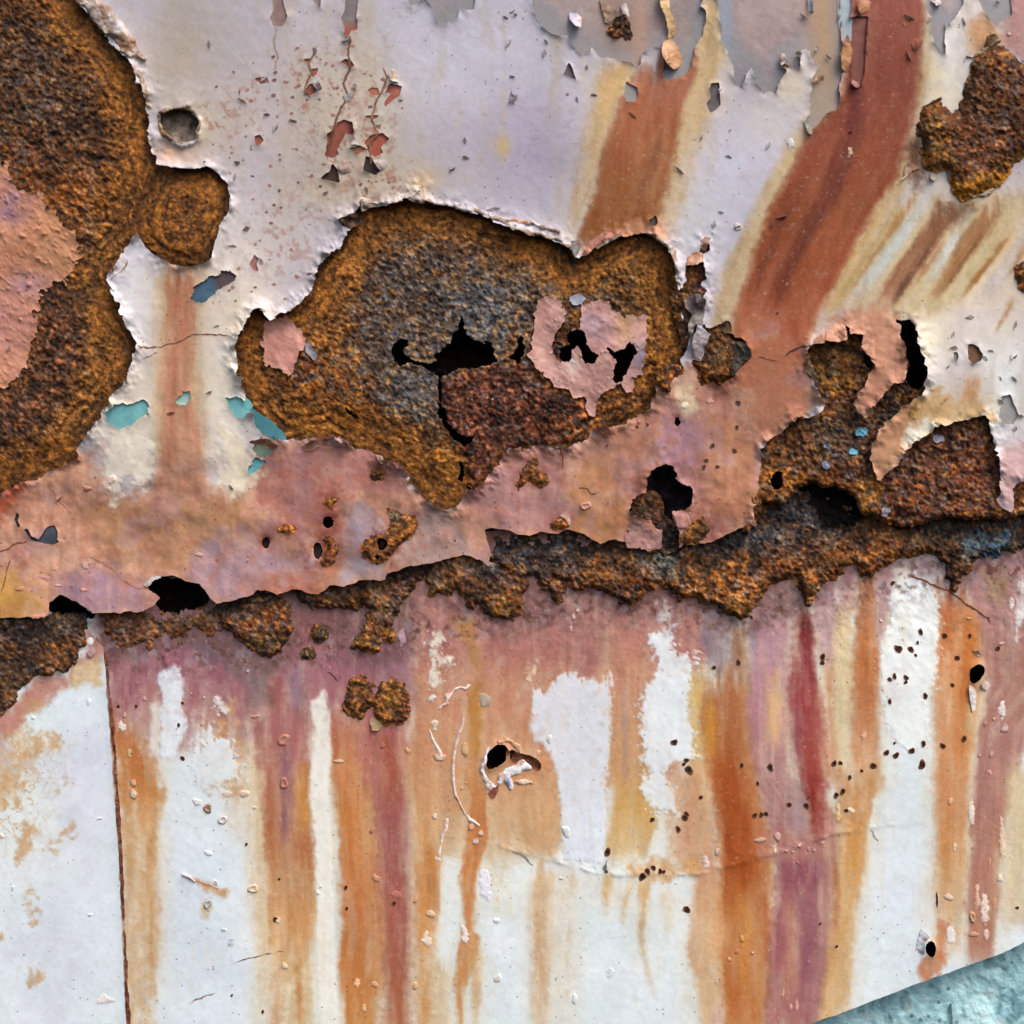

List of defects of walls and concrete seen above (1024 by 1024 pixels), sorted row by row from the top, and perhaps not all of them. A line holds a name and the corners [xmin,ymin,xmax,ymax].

peeling [341,0,358,44]
peeling [532,0,870,134]
peeling [245,47,403,187]
peeling [190,239,271,304]
rust [0,0,723,717]
peeling [102,399,149,429]
peeling [226,395,286,474]
peeling [14,513,59,545]
peeling [625,516,663,552]
peeling [672,510,691,528]
rust [424,0,1024,982]
rust [0,560,897,1024]